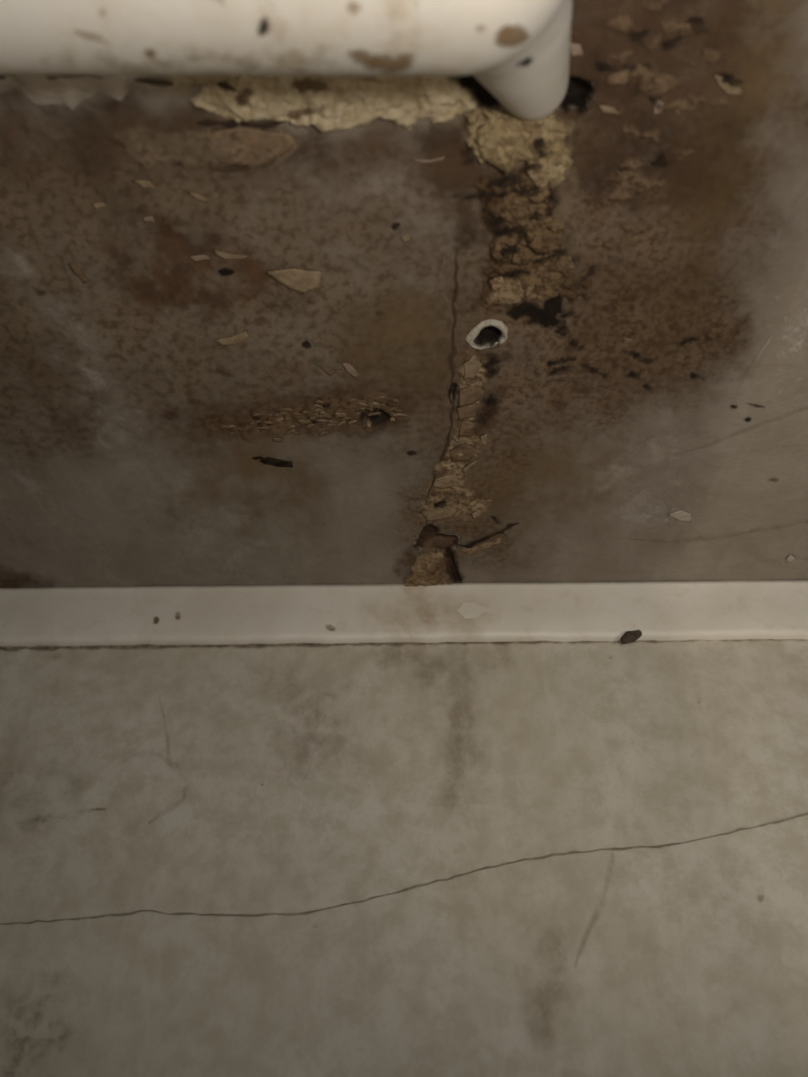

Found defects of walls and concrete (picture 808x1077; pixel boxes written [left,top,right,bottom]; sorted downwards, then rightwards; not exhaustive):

damp [0,576,34,588]
spalling [111,75,597,310]
damp [0,0,778,560]
crack [426,249,459,503]
spalling [397,342,511,587]
crack [1,814,805,924]